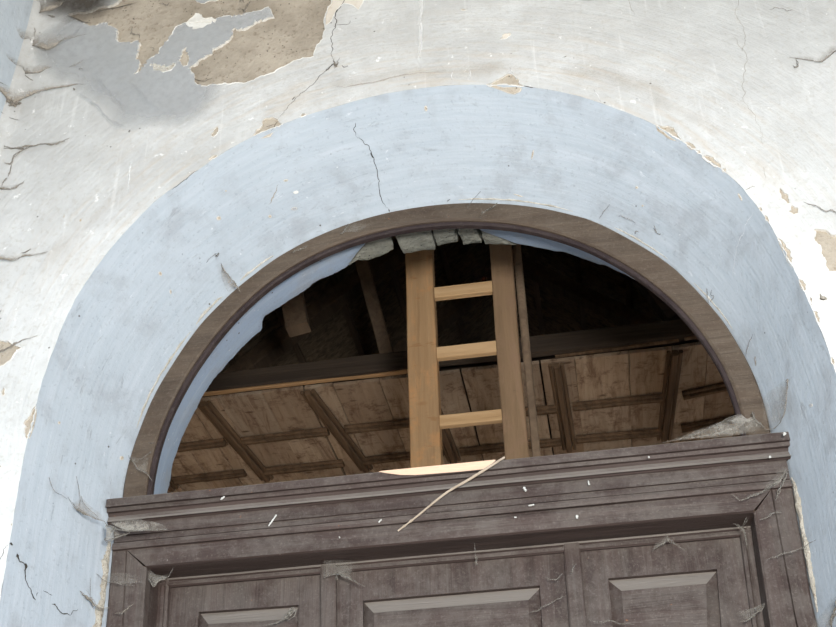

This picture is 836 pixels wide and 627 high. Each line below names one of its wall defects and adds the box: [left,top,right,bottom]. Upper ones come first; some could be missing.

spalling [69,0,364,86]
crack [280,0,347,116]
spalling [485,73,524,95]
crack [353,123,390,212]
spalling [813,229,836,273]
spalling [0,340,22,366]
crack [0,542,77,615]